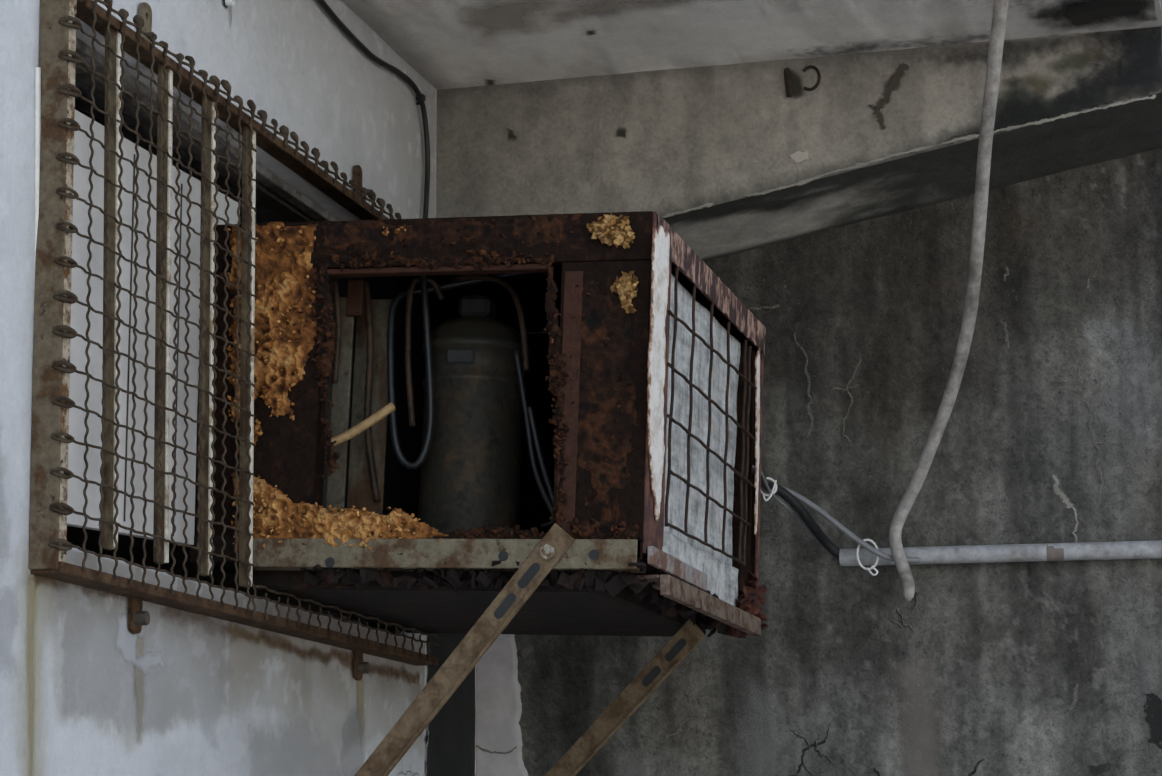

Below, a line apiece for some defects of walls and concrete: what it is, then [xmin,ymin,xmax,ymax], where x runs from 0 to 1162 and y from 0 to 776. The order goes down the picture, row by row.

water stain [994,0,1162,132]
water stain [116,616,164,672]
crack [776,723,832,776]
crack [968,758,985,776]